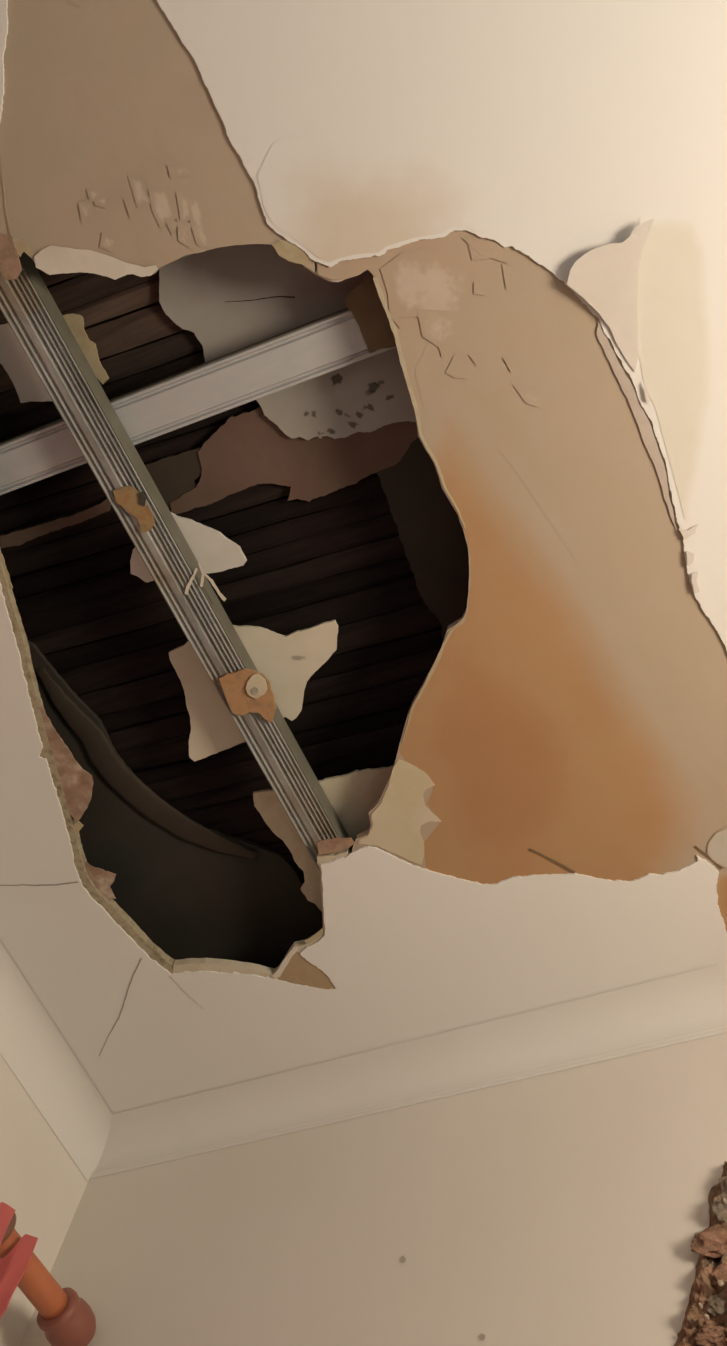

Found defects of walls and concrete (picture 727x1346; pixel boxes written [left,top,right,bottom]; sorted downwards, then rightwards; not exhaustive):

spalling [272,240,309,265]
peeling [567,219,654,402]
spalling [328,371,347,387]
spalling [301,378,398,438]
damp [637,212,716,520]
peeling [678,525,700,593]
damp [400,343,727,884]
spalling [0,549,351,978]
damp [716,870,727,931]
crack [99,958,142,1056]
spalling [675,1162,727,1346]